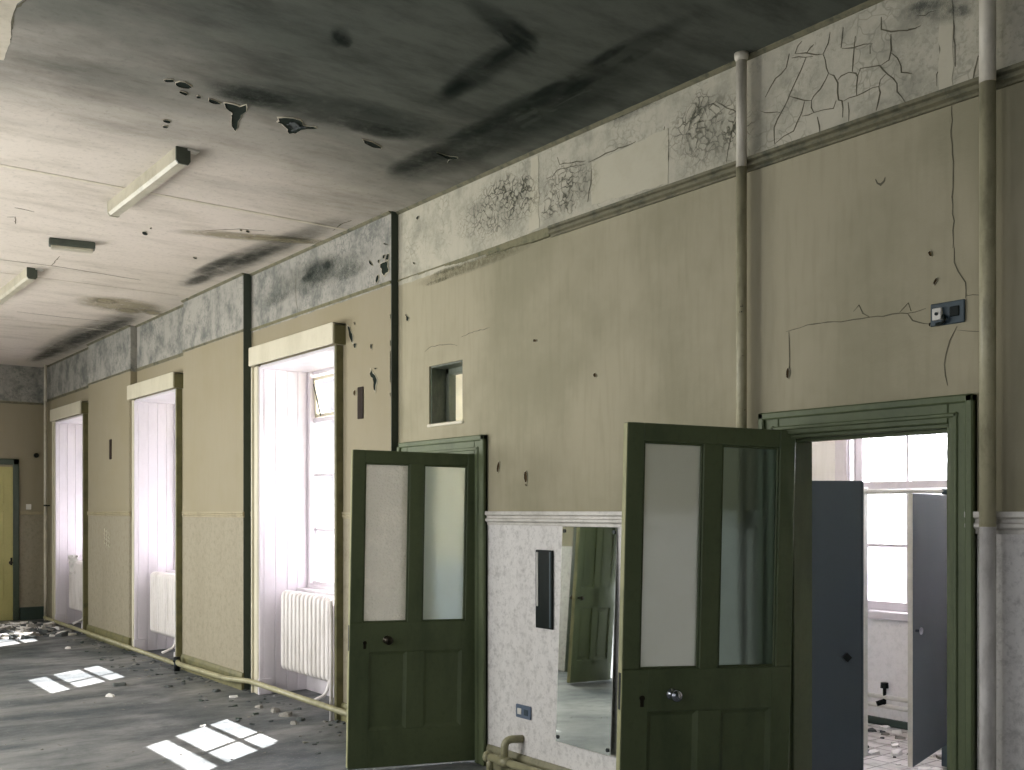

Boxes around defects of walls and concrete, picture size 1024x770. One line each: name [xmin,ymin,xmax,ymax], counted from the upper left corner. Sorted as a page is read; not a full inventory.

peeling [164,78,221,104]
crack [761,0,979,144]
crack [664,97,736,162]
crack [474,141,636,229]
crack [950,105,976,298]
water stain [207,233,315,243]
flaking render [369,243,390,283]
flaking render [370,340,391,396]
crack [786,303,927,377]
crack [944,327,979,386]